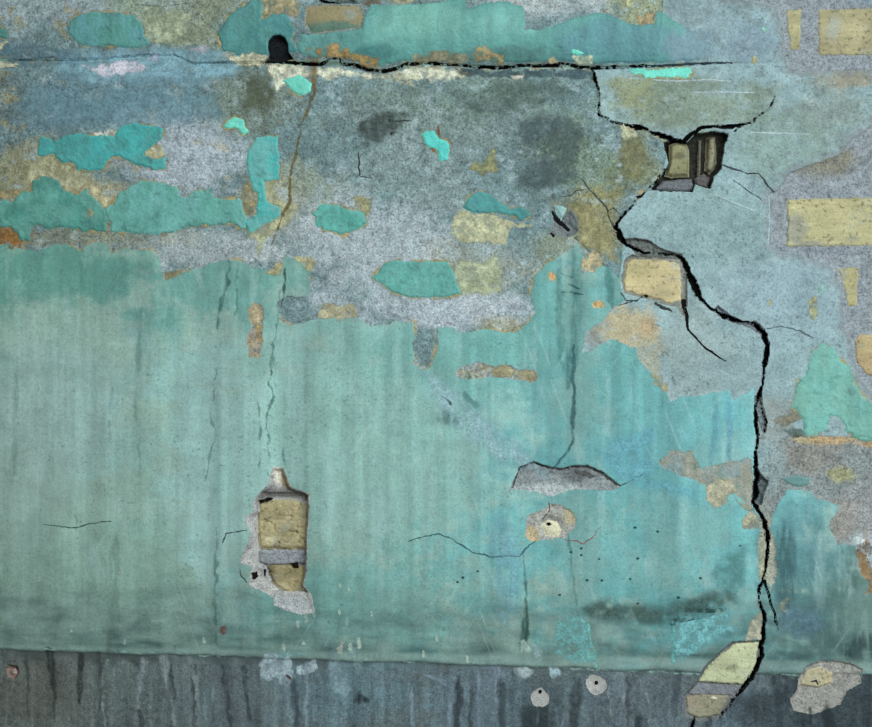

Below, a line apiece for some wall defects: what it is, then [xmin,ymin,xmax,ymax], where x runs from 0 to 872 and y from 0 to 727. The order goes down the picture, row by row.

crack [18,52,776,145]
corrosion [271,68,318,244]
peeling [0,0,766,402]
peeling [466,0,872,595]
crack [561,164,814,719]
crack [409,533,535,558]
leakage [71,639,225,727]
leakage [259,641,318,727]
leakage [518,608,561,678]
leakage [649,596,734,702]
flaking render [683,640,761,722]
flaking render [790,660,863,715]